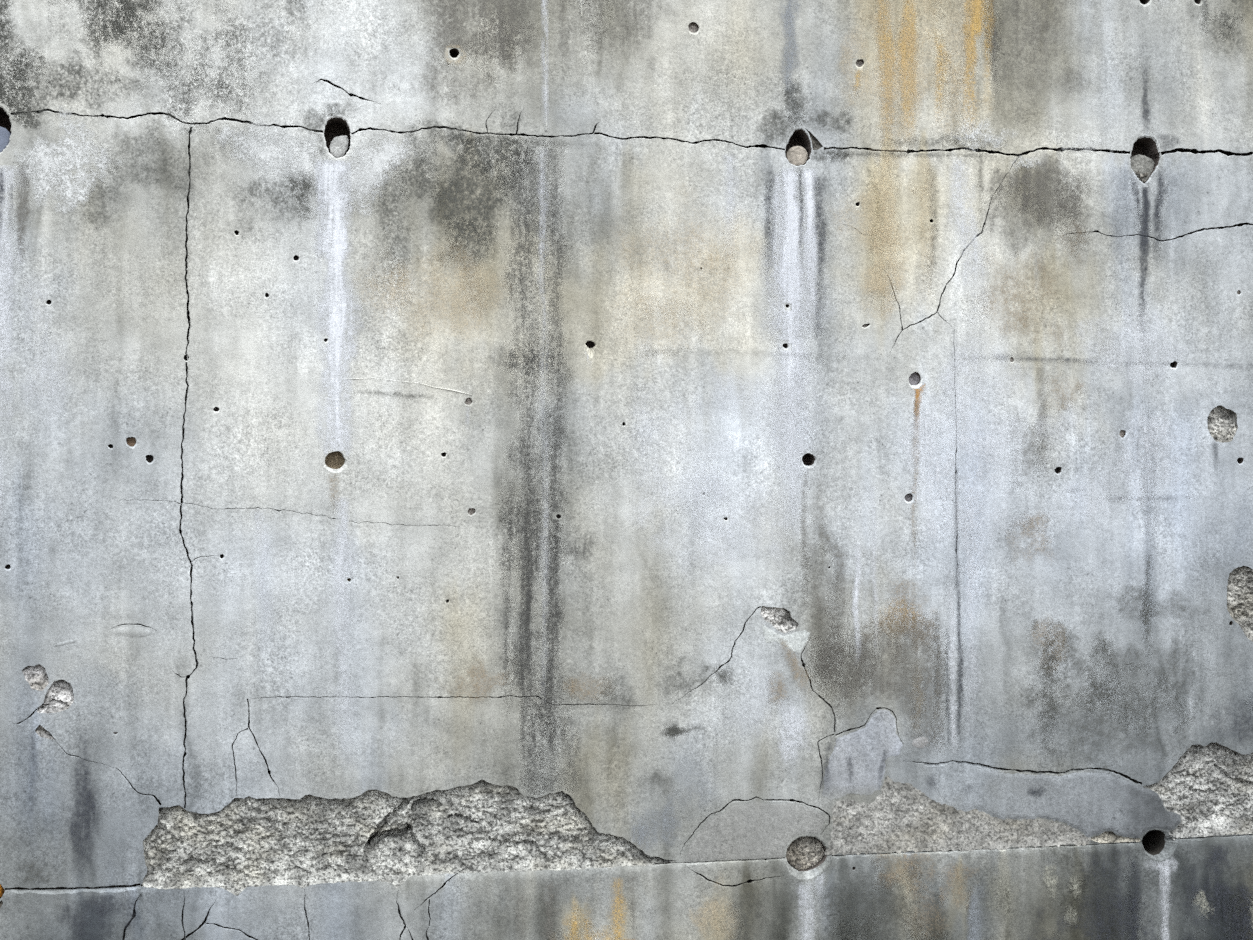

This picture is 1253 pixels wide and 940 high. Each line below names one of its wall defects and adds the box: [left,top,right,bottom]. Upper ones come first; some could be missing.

leakage [0,0,189,359]
crack [9,78,785,807]
leakage [503,308,561,775]
leakage [765,120,1008,506]
crack [824,147,1253,576]
spalling [1227,566,1253,642]
crack [122,892,143,940]
crack [181,894,258,940]
crack [303,889,311,940]
crack [396,865,468,940]
spalling [140,710,1253,896]
crack [680,634,1141,887]